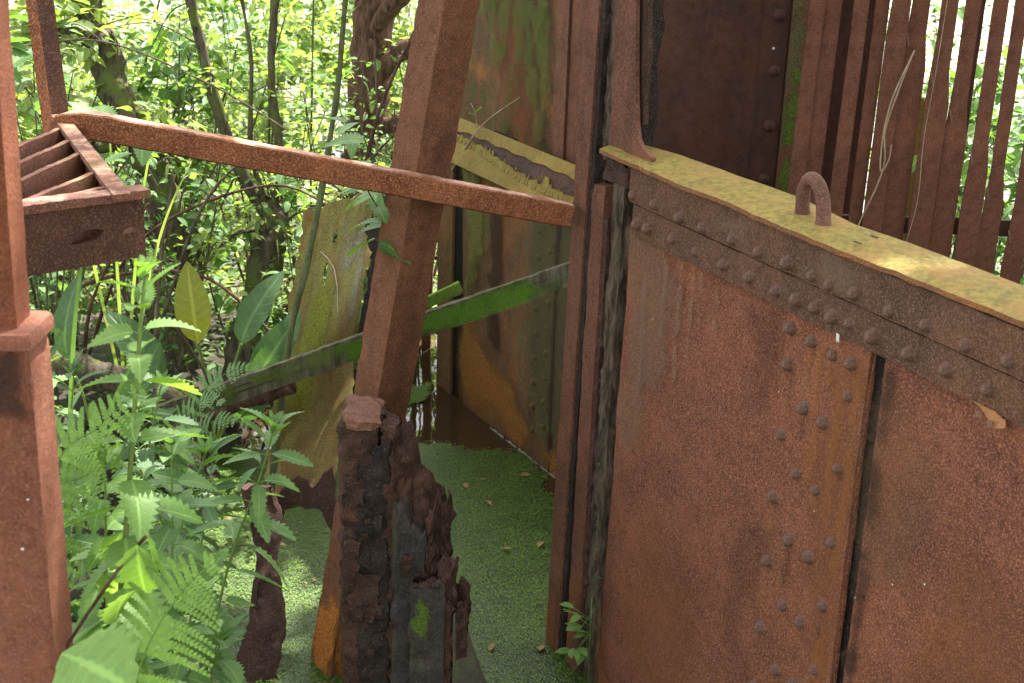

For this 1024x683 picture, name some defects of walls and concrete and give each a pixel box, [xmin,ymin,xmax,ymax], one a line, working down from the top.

peeling [457,133,574,204]
leakage [341,234,363,315]
rust [459,324,528,447]